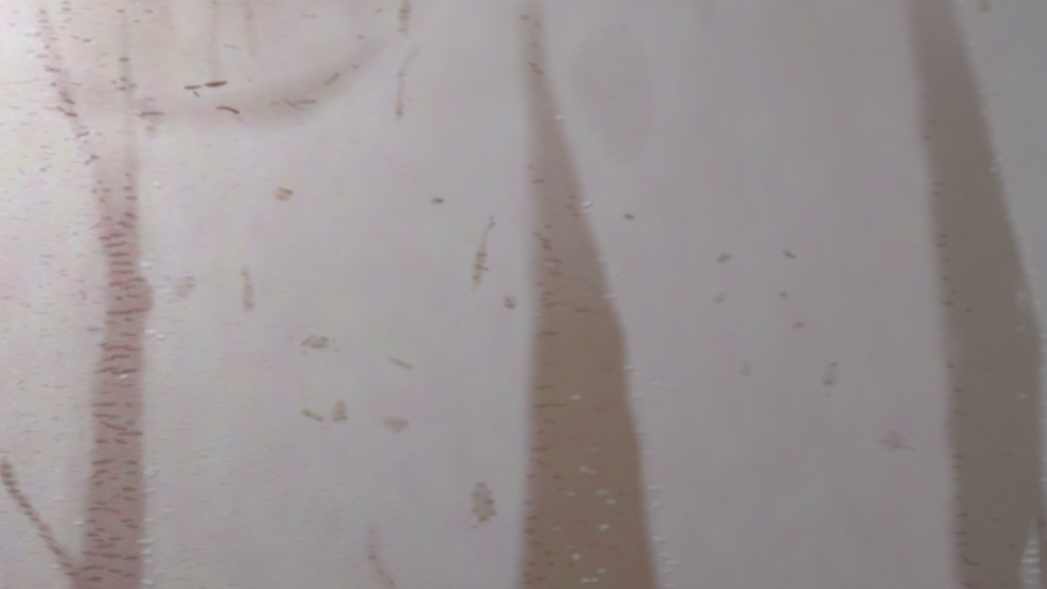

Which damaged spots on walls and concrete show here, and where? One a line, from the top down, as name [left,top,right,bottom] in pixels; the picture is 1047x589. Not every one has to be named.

leakage [942,127,1047,589]